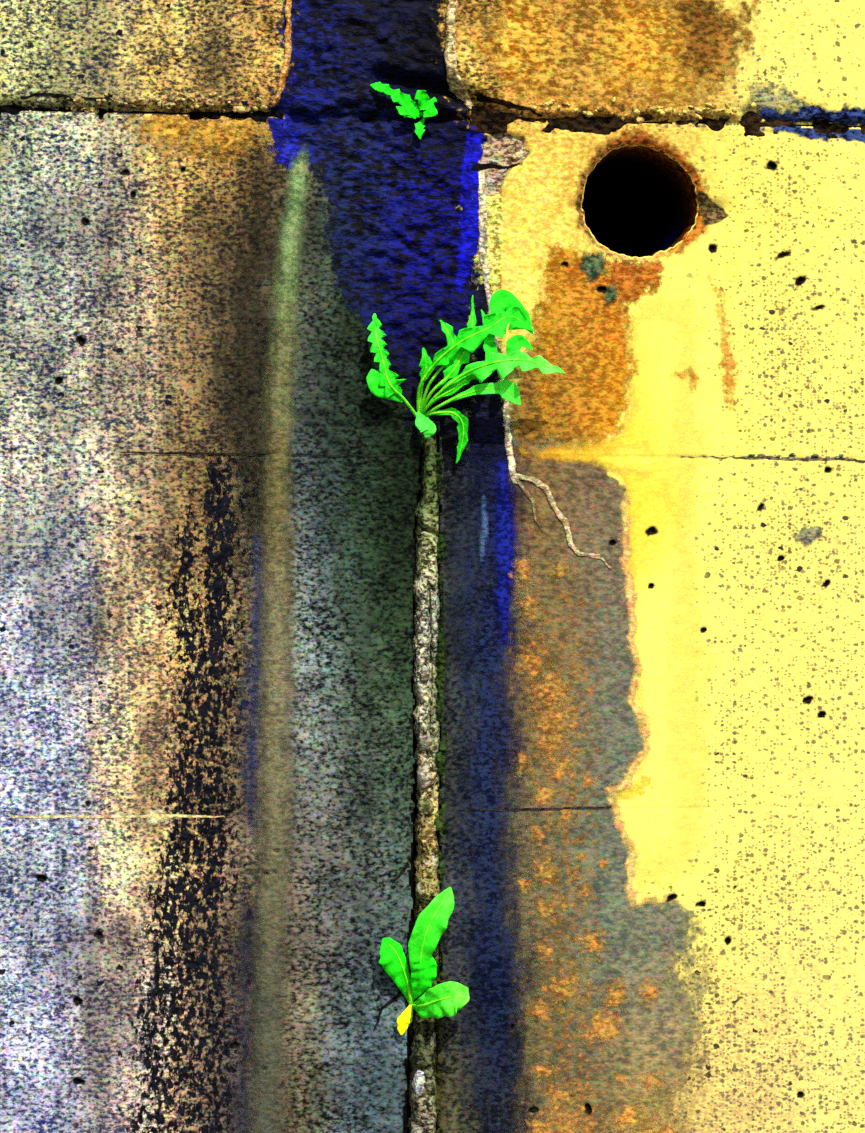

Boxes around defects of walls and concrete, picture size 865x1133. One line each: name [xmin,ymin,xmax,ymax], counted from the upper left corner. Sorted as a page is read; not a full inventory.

rust [508,129,707,453]
rust [473,0,759,105]
rust [715,288,737,408]
leakage [10,186,272,1133]
crack [119,424,612,1133]
peeling [510,560,678,1133]